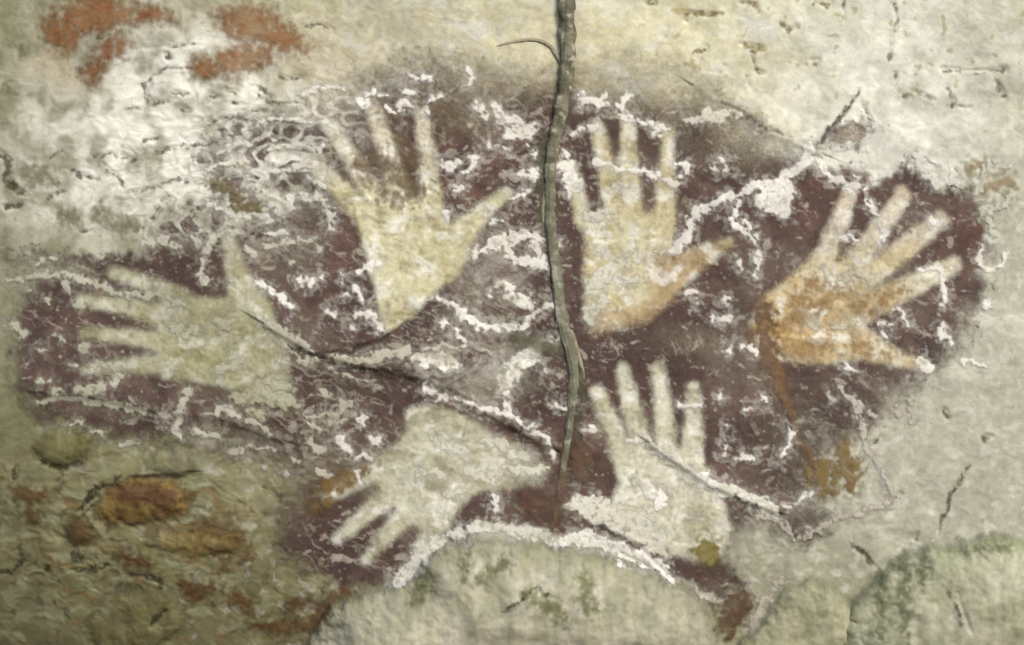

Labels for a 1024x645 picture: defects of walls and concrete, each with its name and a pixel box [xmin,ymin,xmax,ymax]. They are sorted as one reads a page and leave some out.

crack [813,91,869,148]
leakage [10,69,995,598]
crack [940,466,970,523]
leakage [522,591,565,620]
leakage [580,577,596,616]